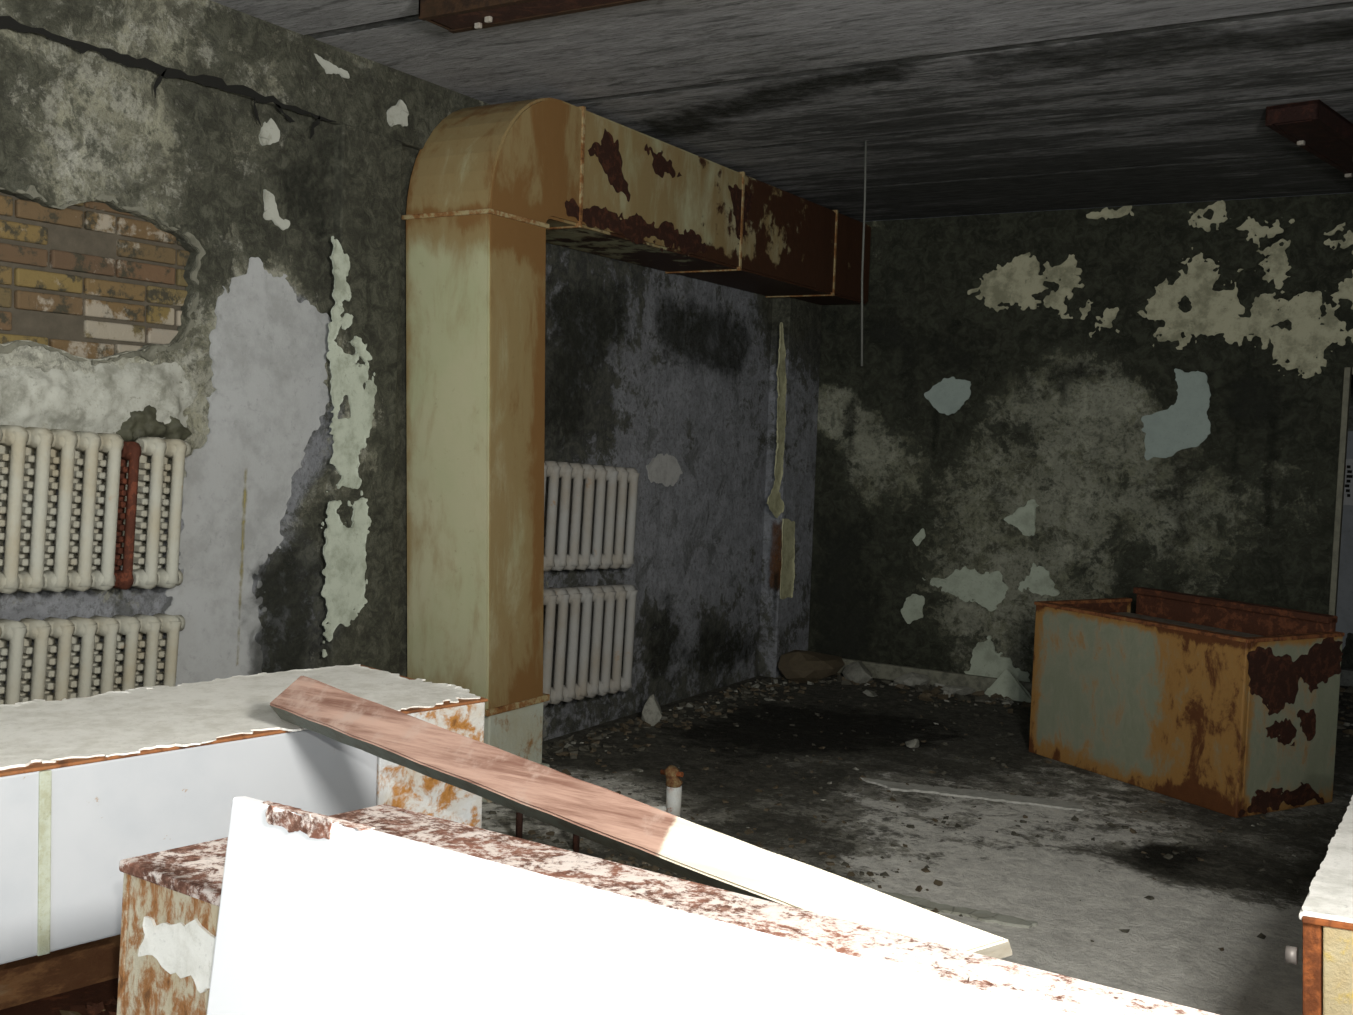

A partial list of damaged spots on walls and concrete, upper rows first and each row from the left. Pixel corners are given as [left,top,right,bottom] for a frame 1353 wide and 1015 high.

crack [0,16,336,139]
damp [643,63,906,135]
damp [980,19,1353,75]
spalling [0,185,206,365]
corrosion [565,129,707,257]
damp [657,300,749,375]
corrosion [728,184,753,244]
peeling [967,252,1119,337]
peeling [1137,200,1353,379]
peeling [164,236,377,686]
peeling [1141,368,1211,460]
damp [253,550,309,675]